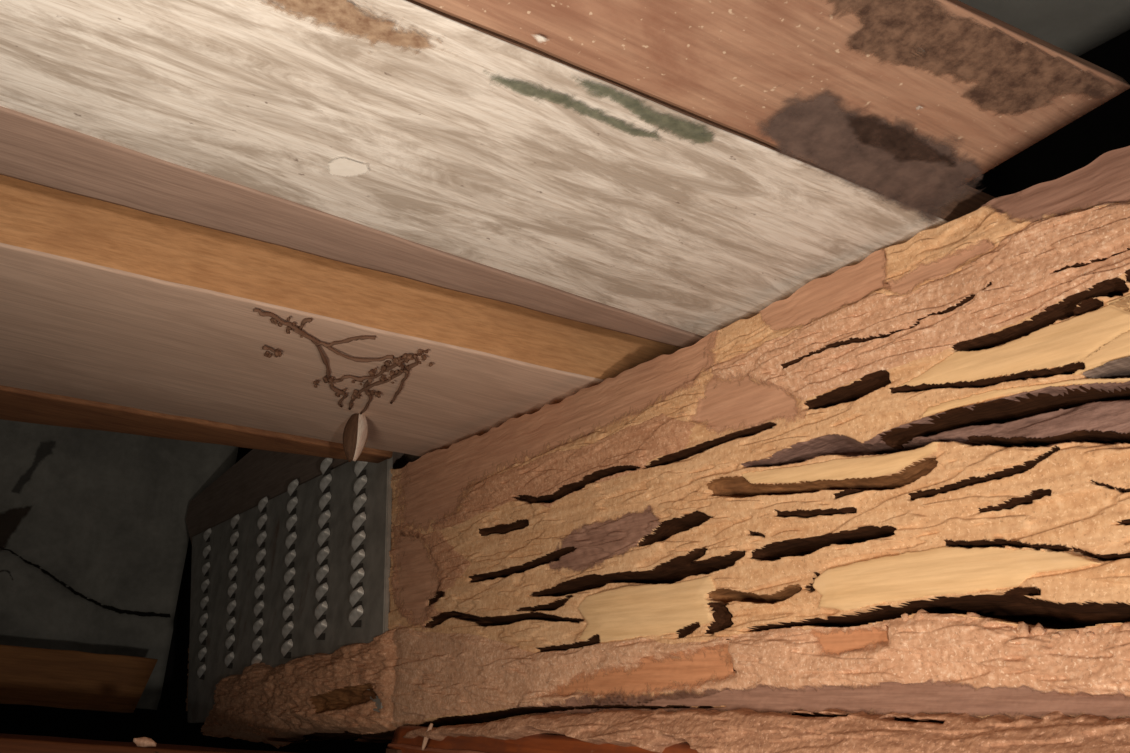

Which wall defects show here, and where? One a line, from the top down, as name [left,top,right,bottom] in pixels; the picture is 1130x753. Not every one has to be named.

damp [493,76,713,143]
damp [762,92,982,224]
crack [781,282,992,369]
crack [952,248,1130,351]
crack [804,362,1085,409]
crack [479,422,776,536]
crack [775,489,865,518]
crack [908,446,1060,513]
crack [1090,480,1130,493]
crack [469,547,577,582]
crack [423,591,600,653]
crack [676,572,820,640]